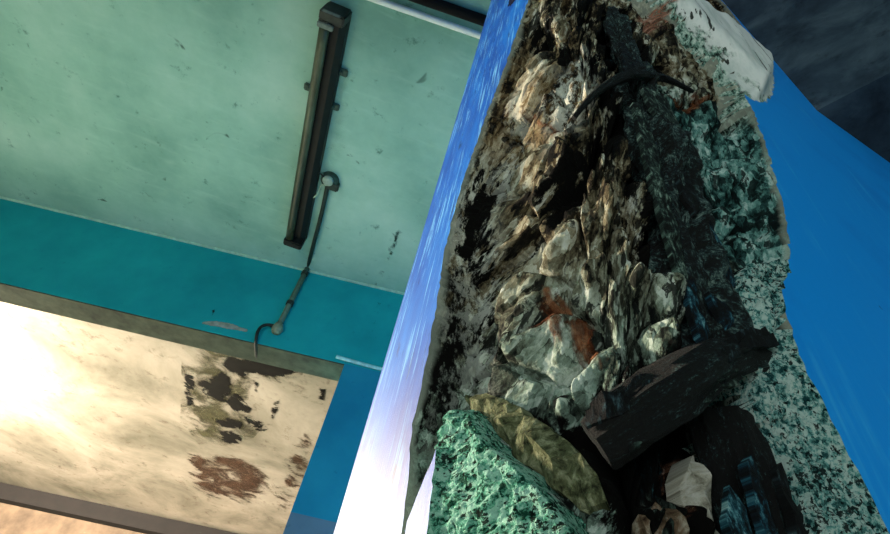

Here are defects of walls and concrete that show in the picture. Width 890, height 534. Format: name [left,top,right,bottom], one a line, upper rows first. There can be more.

leakage [181,350,302,444]
spalling [401,0,890,534]